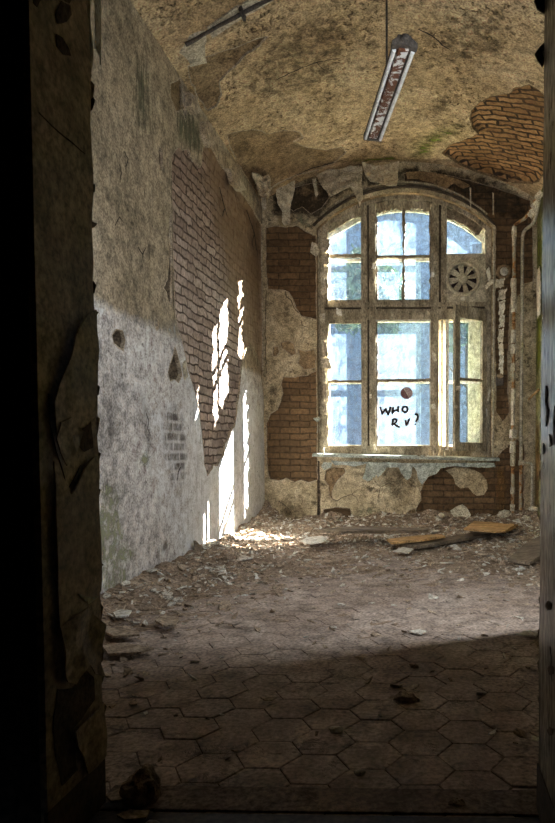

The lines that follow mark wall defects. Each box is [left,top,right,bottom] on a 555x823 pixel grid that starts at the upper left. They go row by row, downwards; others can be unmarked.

peeling [534,0,545,14]
peeling [261,19,343,95]
peeling [446,18,499,58]
peeling [535,43,544,68]
spalling [158,36,526,518]
spalling [442,84,544,441]
spalling [112,329,126,351]